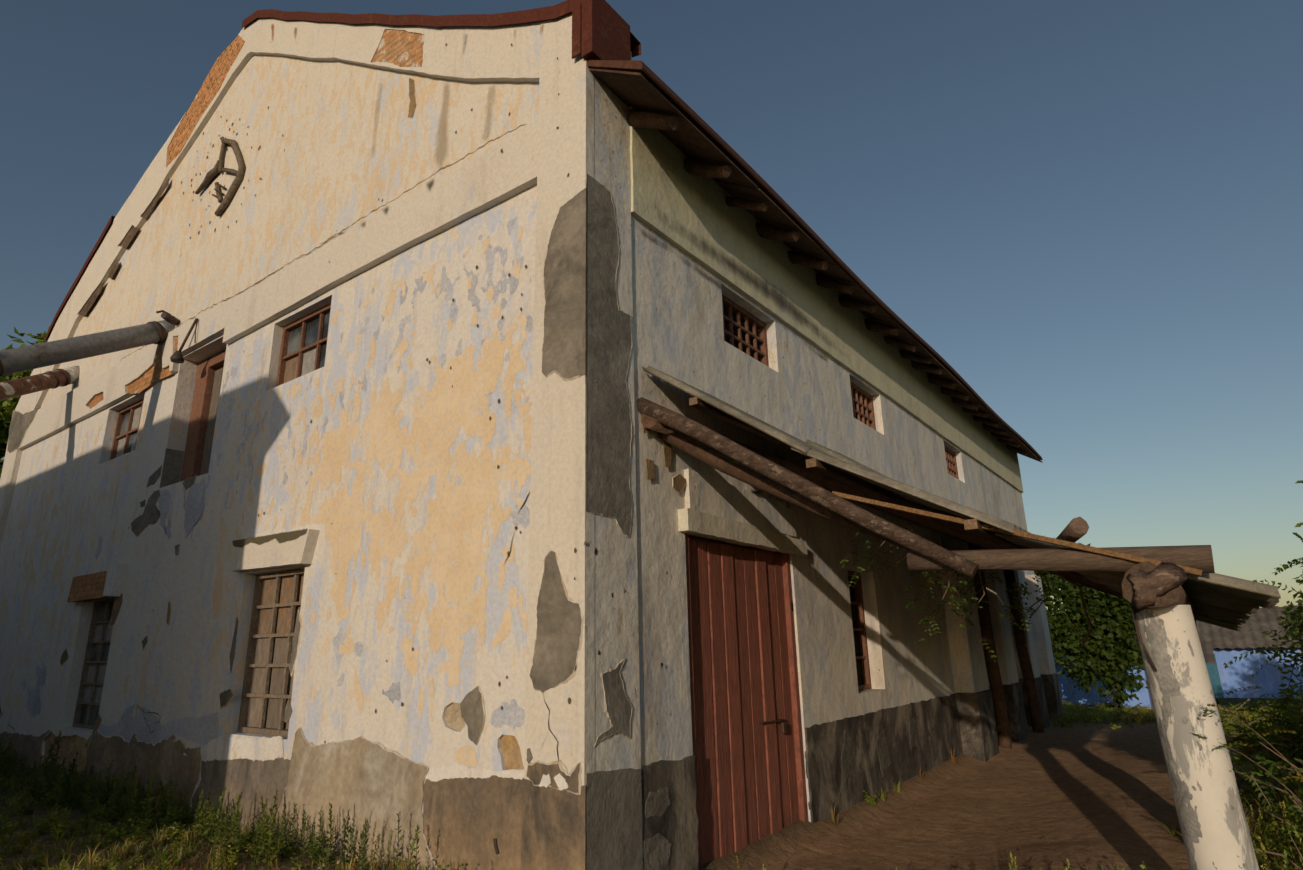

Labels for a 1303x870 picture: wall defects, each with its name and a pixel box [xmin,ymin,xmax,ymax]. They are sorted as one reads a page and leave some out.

flaking render [371,29,425,118]
flaking render [79,35,260,316]
flaking render [88,393,104,408]
peeling [127,218,582,795]
flaking render [0,699,292,819]
crack [540,700,568,774]
peeling [1141,612,1217,870]